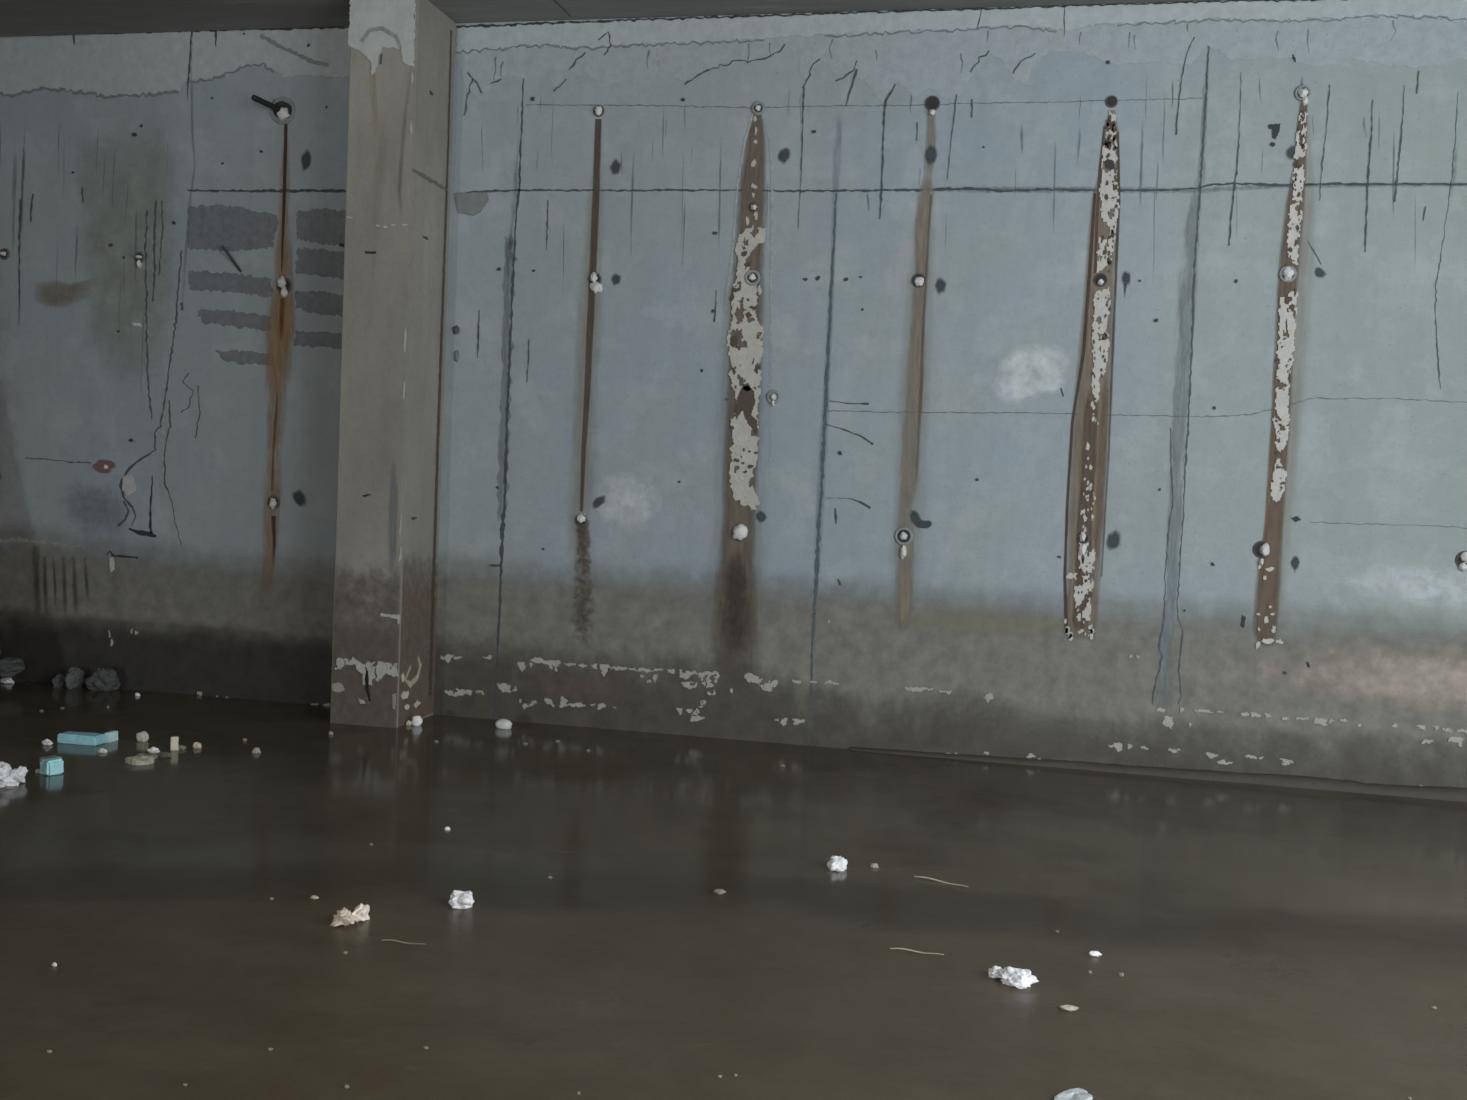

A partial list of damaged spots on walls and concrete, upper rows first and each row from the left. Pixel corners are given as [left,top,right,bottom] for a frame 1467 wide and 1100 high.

flaking render [348,0,416,112]
crack [25,189,346,573]
corrosion [267,124,293,568]
crack [364,670,372,703]
corrosion [576,119,601,630]
leakage [0,538,1467,788]
corrosion [718,114,773,661]
corrosion [898,525,912,627]
corrosion [903,115,935,503]
crack [413,0,1467,746]
corrosion [1064,110,1120,641]
corrosion [1256,104,1308,649]